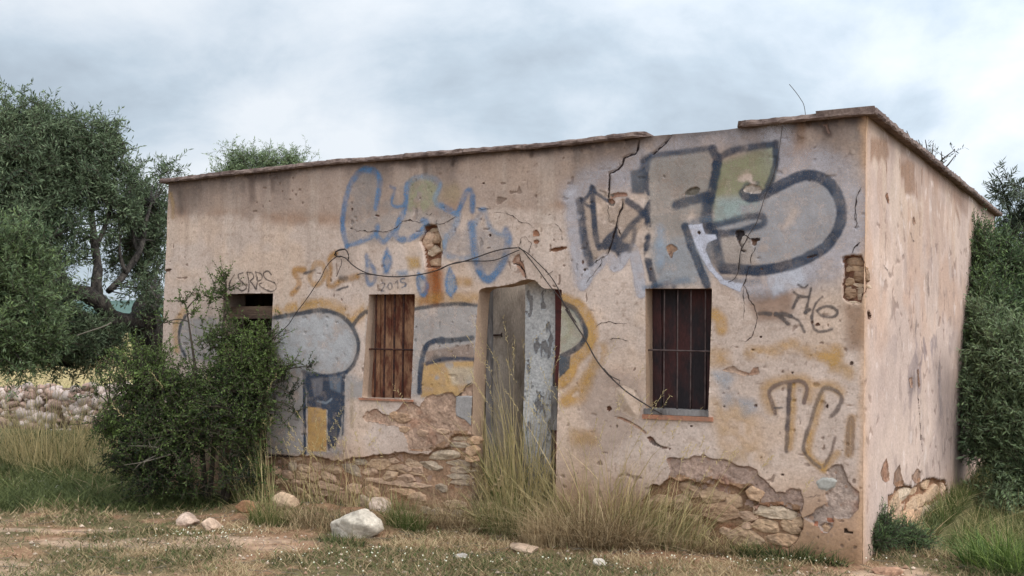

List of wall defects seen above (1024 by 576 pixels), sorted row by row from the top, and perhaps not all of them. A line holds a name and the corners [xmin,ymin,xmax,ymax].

flaking render [422,225,443,268]
crack [591,136,672,276]
crack [740,235,760,342]
flaking render [843,255,871,319]
flaking render [265,385,483,523]
flaking render [607,406,859,552]
flaking render [881,458,948,524]